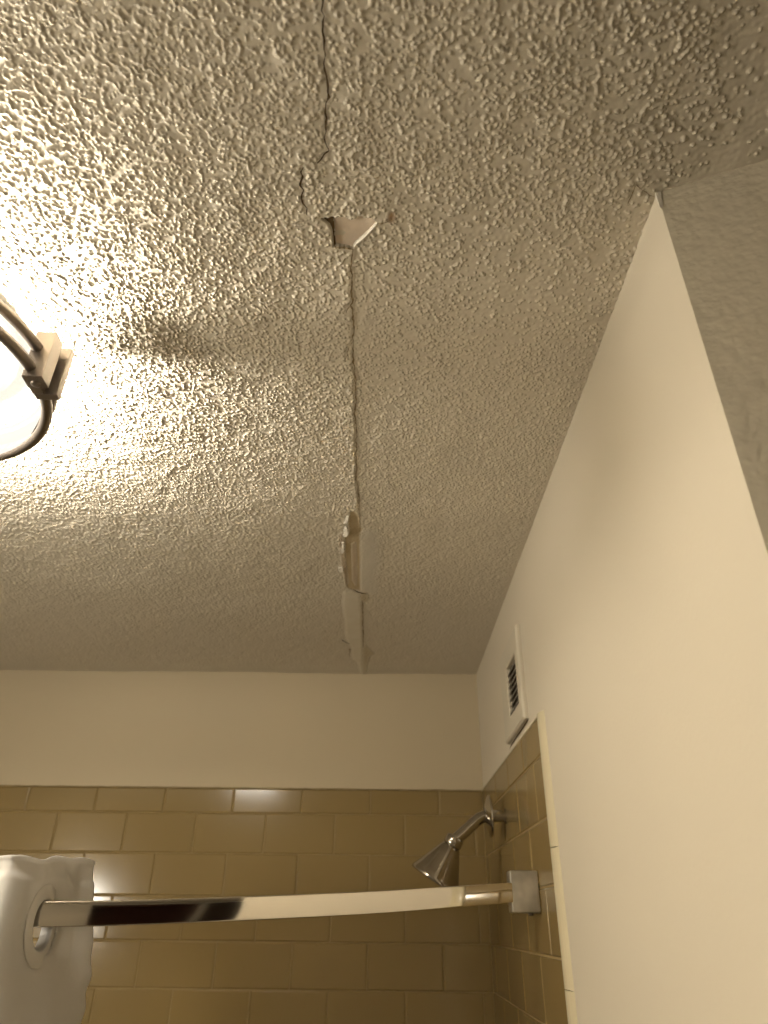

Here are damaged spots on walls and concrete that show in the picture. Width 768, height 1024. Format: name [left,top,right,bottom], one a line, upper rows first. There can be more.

crack [299,0,330,214]
spalling [324,216,378,250]
crack [346,250,361,518]
peeling [341,589,375,674]